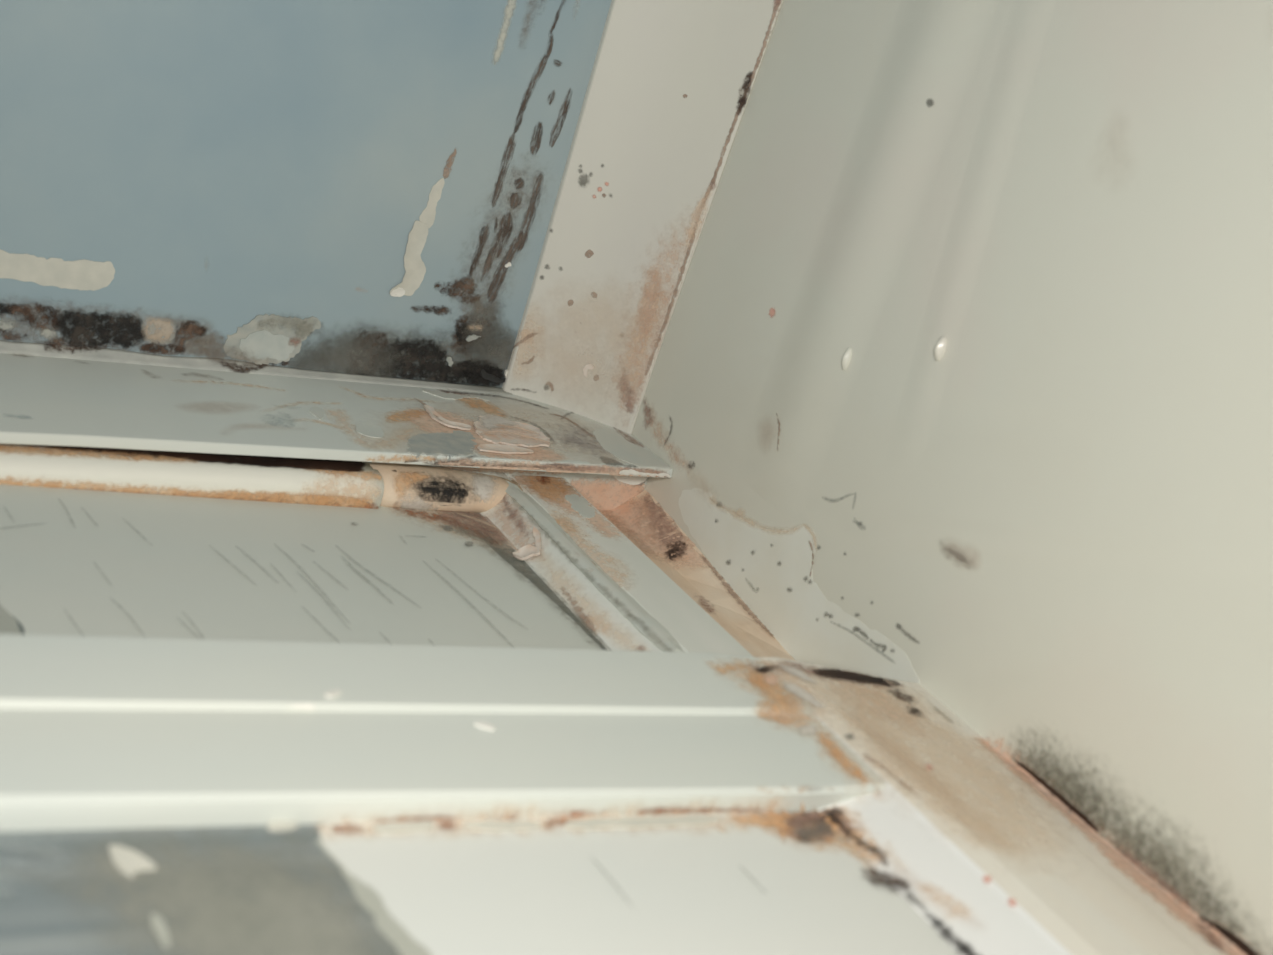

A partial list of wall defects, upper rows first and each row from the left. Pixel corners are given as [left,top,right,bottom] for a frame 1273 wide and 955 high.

peeling [390,149,456,297]
water stain [297,1,570,460]
peeling [0,249,115,291]
water stain [0,303,180,354]
peeling [221,314,321,373]
corrosion [0,479,378,509]
water stain [0,444,468,506]
corrosion [514,475,625,581]
corrosion [716,662,813,726]
corrosion [638,808,790,829]
peeling [108,844,156,878]
water stain [1017,755,1257,955]